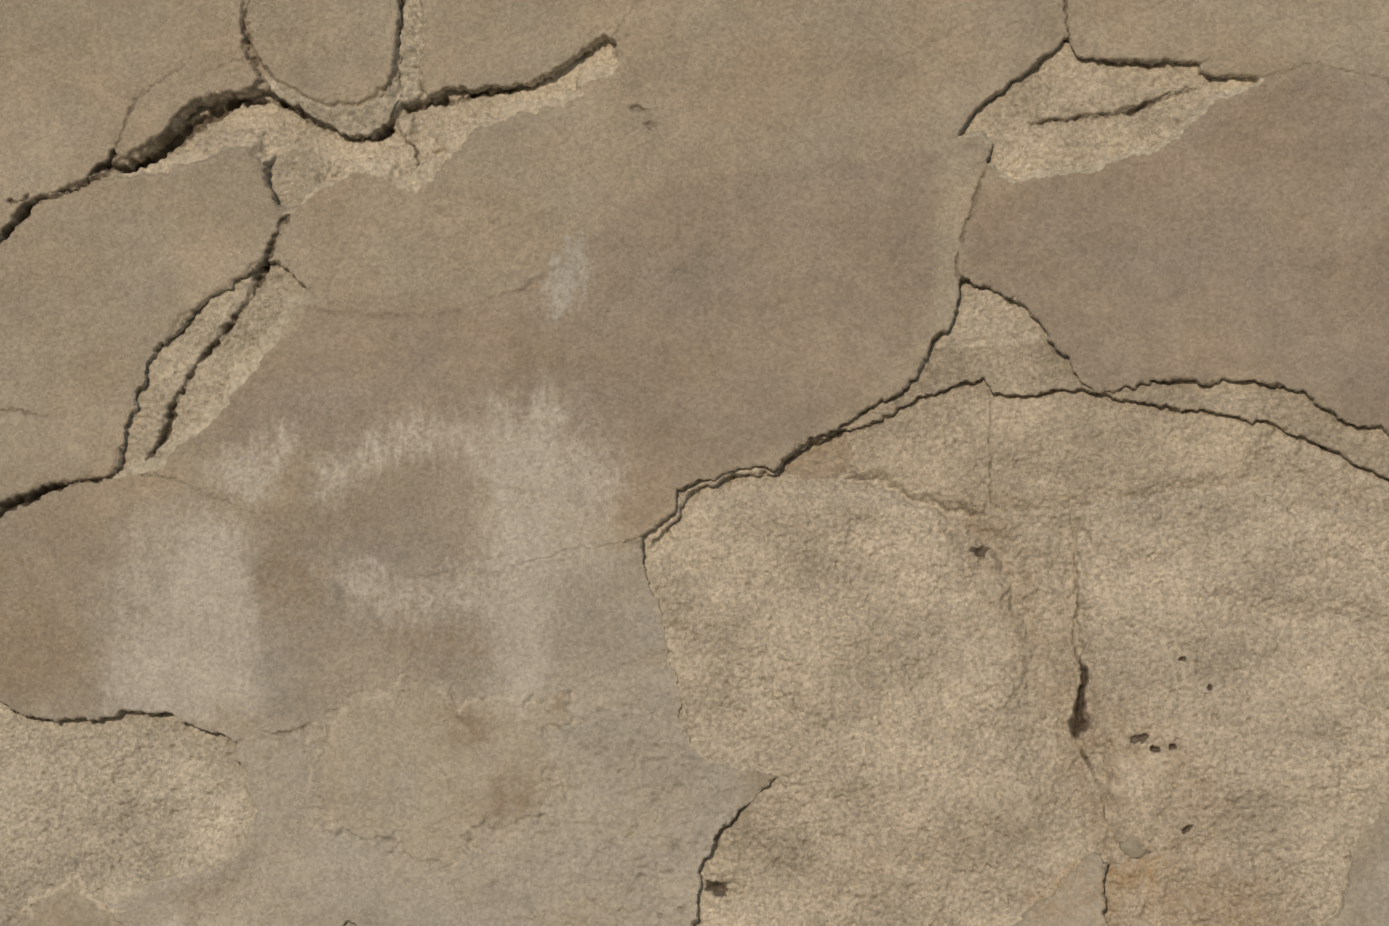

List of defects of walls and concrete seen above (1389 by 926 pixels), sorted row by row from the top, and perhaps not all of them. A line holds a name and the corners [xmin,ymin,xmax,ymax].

crack [0,0,524,243]
spalling [118,0,623,217]
crack [955,161,990,280]
spalling [958,38,1264,184]
crack [0,214,319,547]
spalling [112,260,307,482]
crack [987,392,995,505]
spalling [450,277,1389,926]
crack [1068,510,1110,844]
spalling [0,702,258,926]